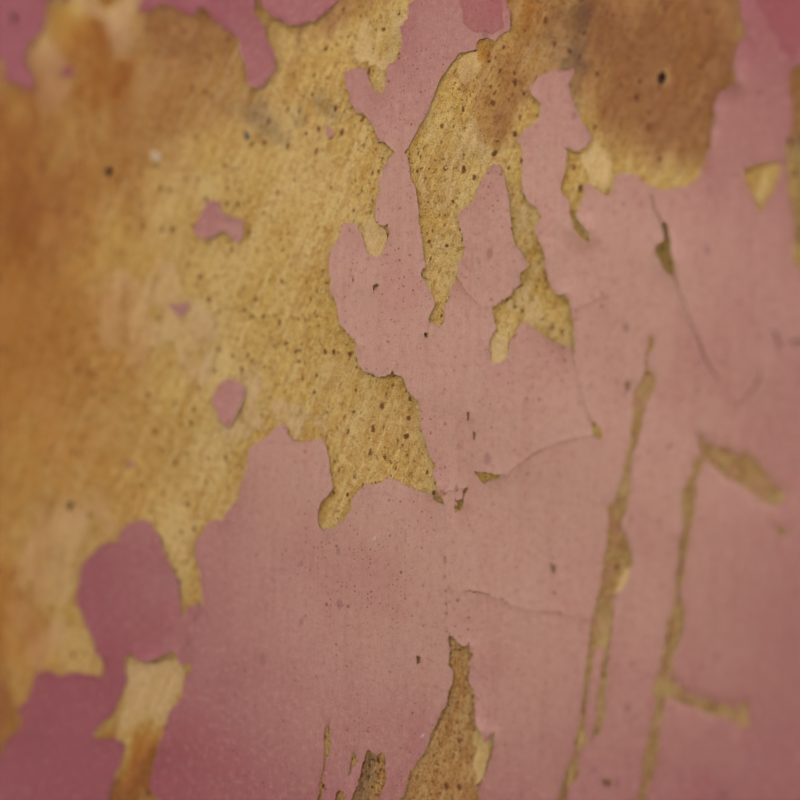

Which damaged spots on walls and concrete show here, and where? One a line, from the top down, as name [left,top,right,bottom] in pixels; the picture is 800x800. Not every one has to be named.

peeling [743,65,800,271]
peeling [0,0,444,757]
peeling [455,487,468,513]
peeling [475,471,504,484]
peeling [93,652,192,800]
peeling [335,750,387,800]
peeling [395,635,495,800]